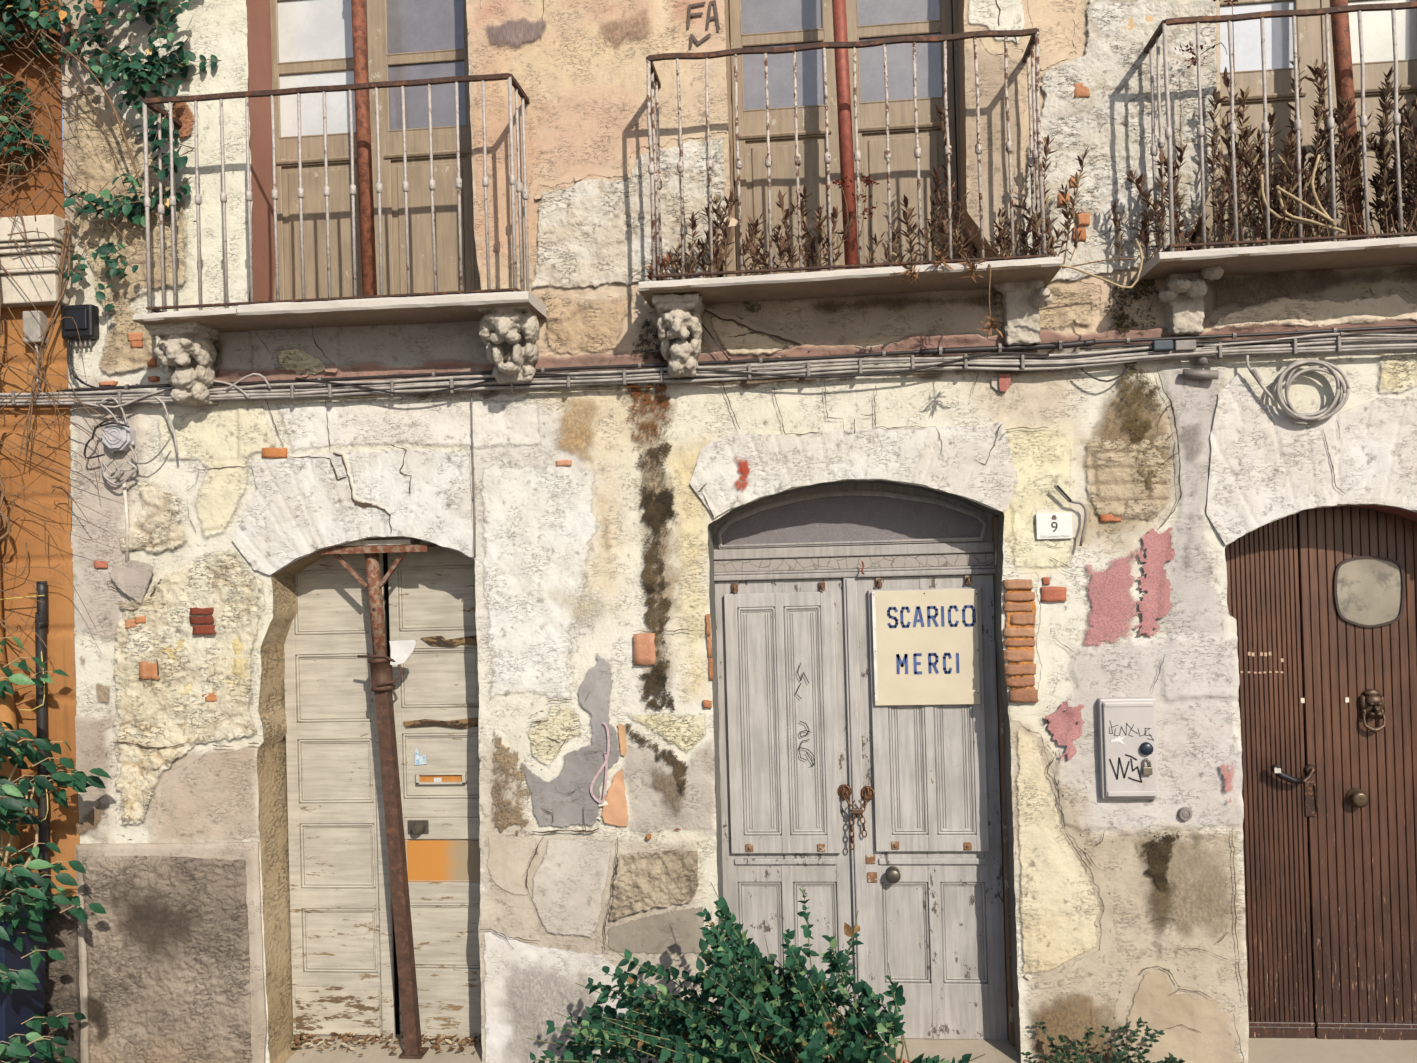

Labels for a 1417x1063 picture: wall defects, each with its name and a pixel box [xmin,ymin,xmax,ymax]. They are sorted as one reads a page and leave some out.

flaking render [520,121,738,354]
flaking render [965,0,1217,343]
flaking render [108,616,146,661]
flaking render [139,607,216,680]
crack [265,399,412,533]
flaking render [158,397,599,782]
water stain [557,385,620,459]
water stain [635,393,679,711]
spalling [1003,433,1173,987]